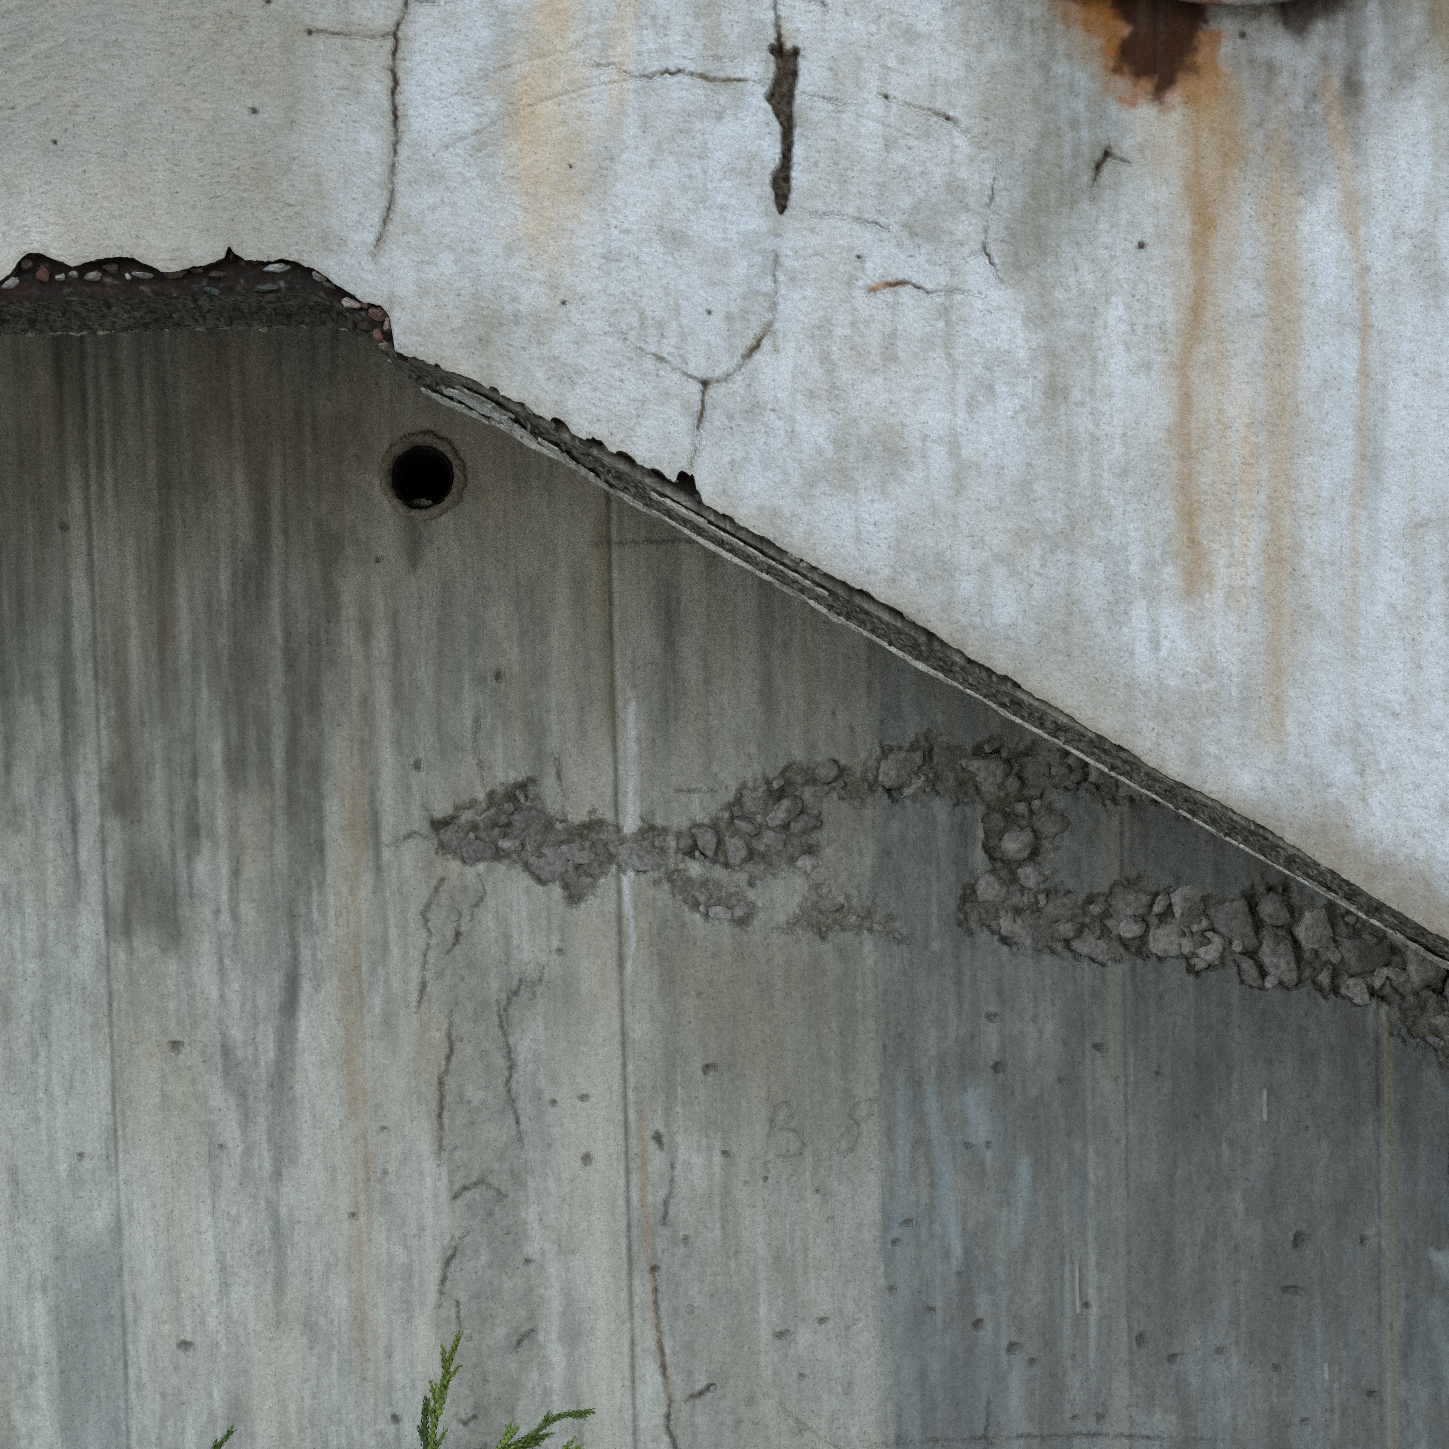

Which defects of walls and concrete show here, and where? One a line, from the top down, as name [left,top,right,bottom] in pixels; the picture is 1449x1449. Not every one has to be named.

crack [304,0,458,261]
crack [603,249,780,472]
crack [583,0,1007,298]
spalling [1135,240,1149,252]
corrosion [1028,0,1377,775]
water stain [513,535,596,802]
water stain [619,552,691,833]
spalling [0,247,1449,970]
water stain [745,568,797,734]
corrosion [1402,421,1425,701]
water stain [0,326,484,1449]
crack [652,1275,716,1449]